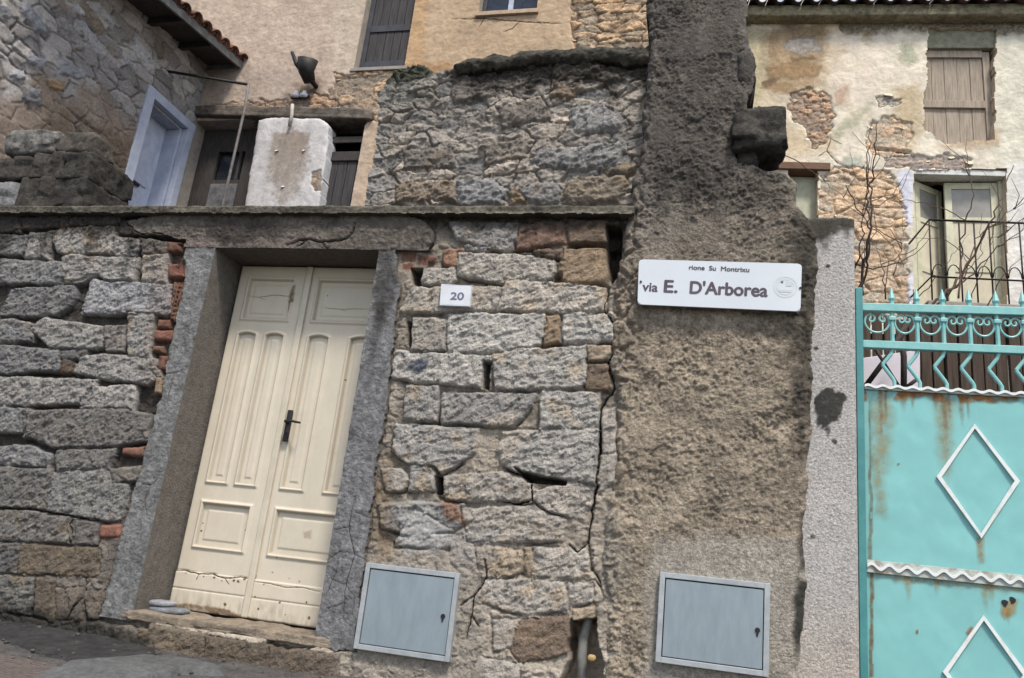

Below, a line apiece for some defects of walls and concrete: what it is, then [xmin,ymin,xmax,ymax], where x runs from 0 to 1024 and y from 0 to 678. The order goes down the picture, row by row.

spalling [224,71,393,122]
spalling [788,88,835,149]
spalling [817,92,973,325]
crack [290,226,355,251]
water stain [814,387,847,443]
rust [864,389,1018,438]
crack [504,471,564,517]
crack [571,357,616,587]
crack [173,499,369,614]
crack [462,566,488,634]
rust [1002,601,1015,617]